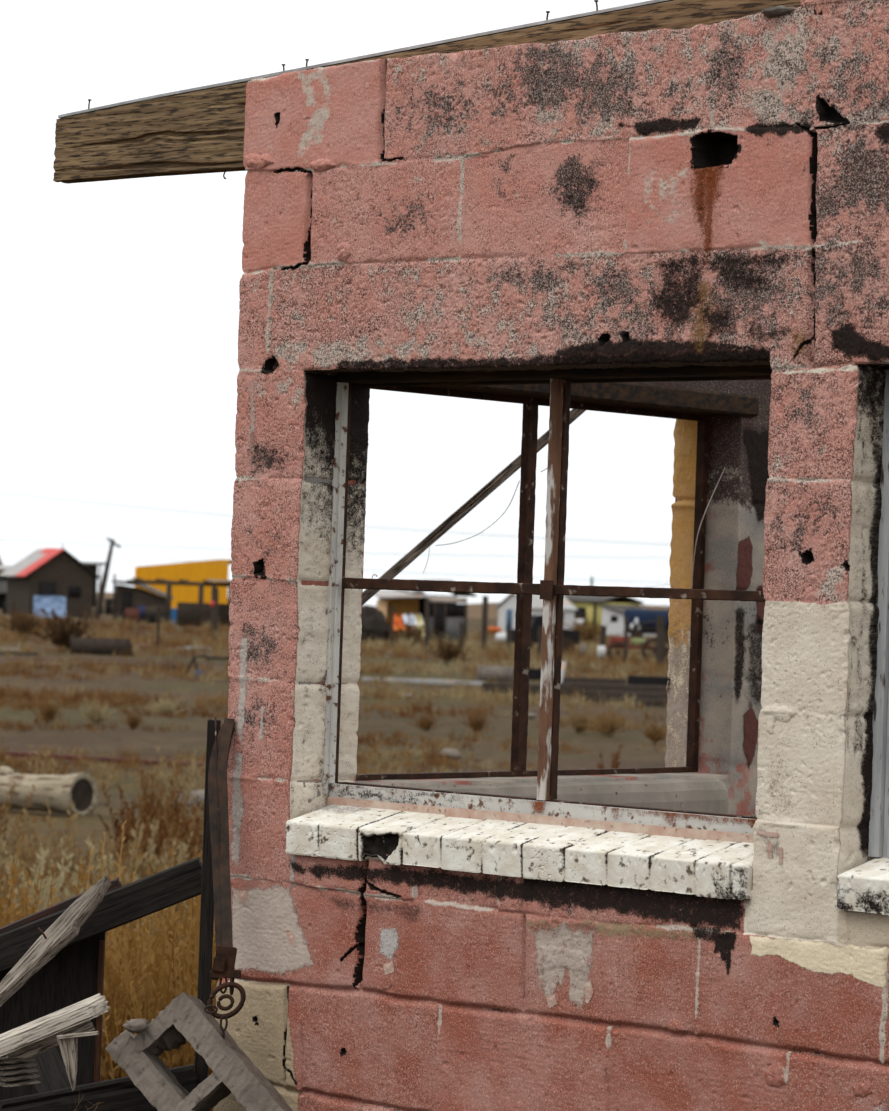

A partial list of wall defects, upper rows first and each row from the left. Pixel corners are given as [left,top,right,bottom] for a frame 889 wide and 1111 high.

rust [689,165,724,261]
spalling [360,832,400,862]
peeling [232,884,314,974]
crack [340,878,400,989]
peeling [380,928,399,975]
peeling [530,921,594,1008]
peeling [850,969,887,989]